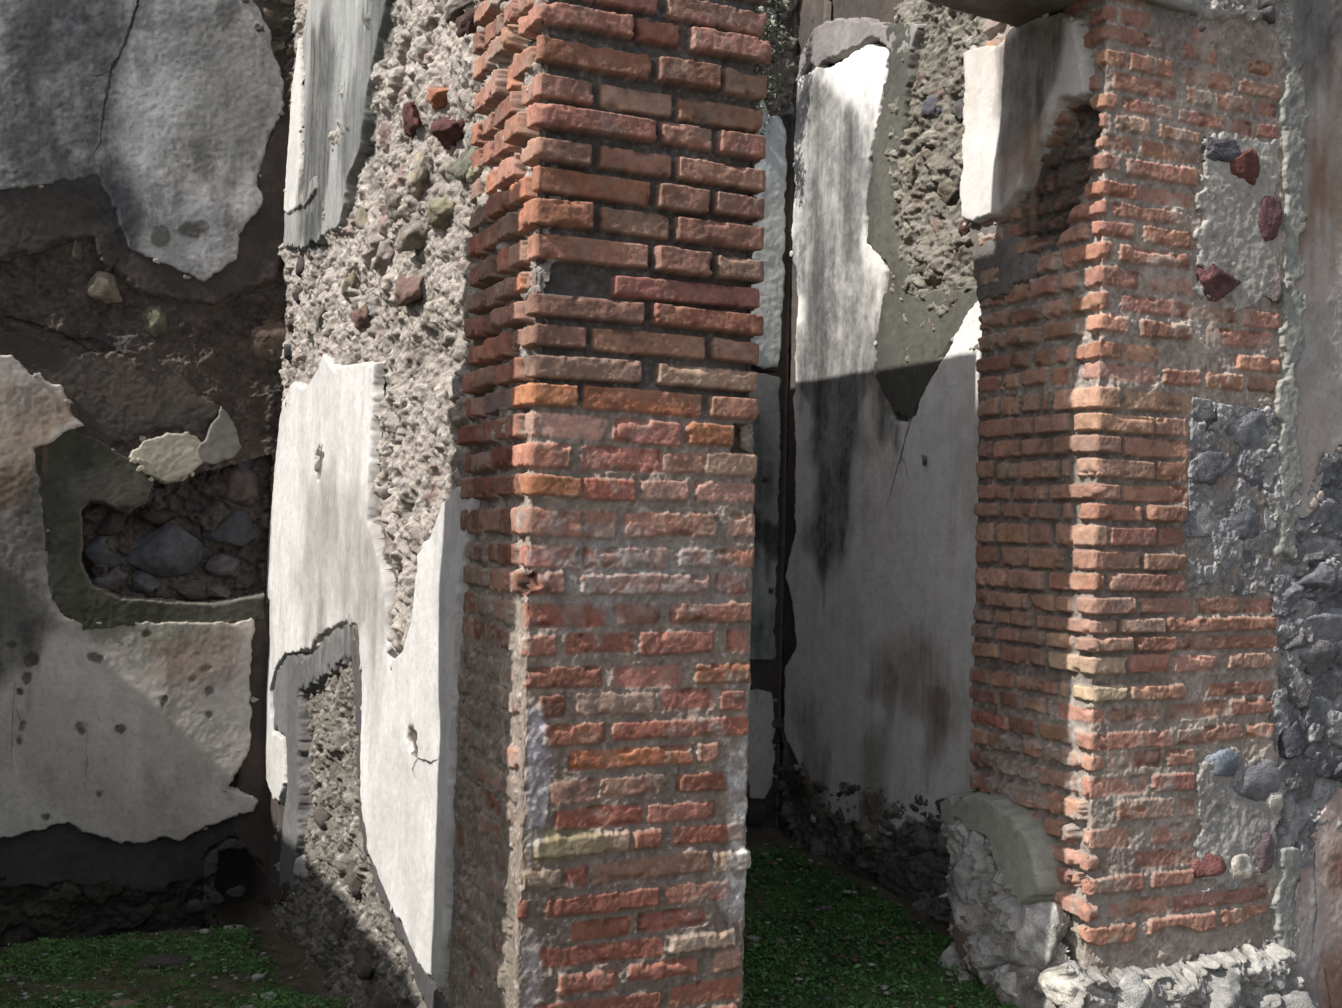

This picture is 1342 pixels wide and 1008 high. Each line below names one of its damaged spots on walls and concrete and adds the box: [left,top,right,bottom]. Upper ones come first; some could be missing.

flaking render [830,0,901,25]
crack [89,0,140,168]
flaking render [151,221,209,265]
spalling [283,257,305,361]
water stain [792,76,879,573]
spalling [0,330,274,603]
flaking render [314,450,324,478]
peeling [1309,490,1324,509]
flaking render [336,705,362,770]
spalling [185,837,248,927]